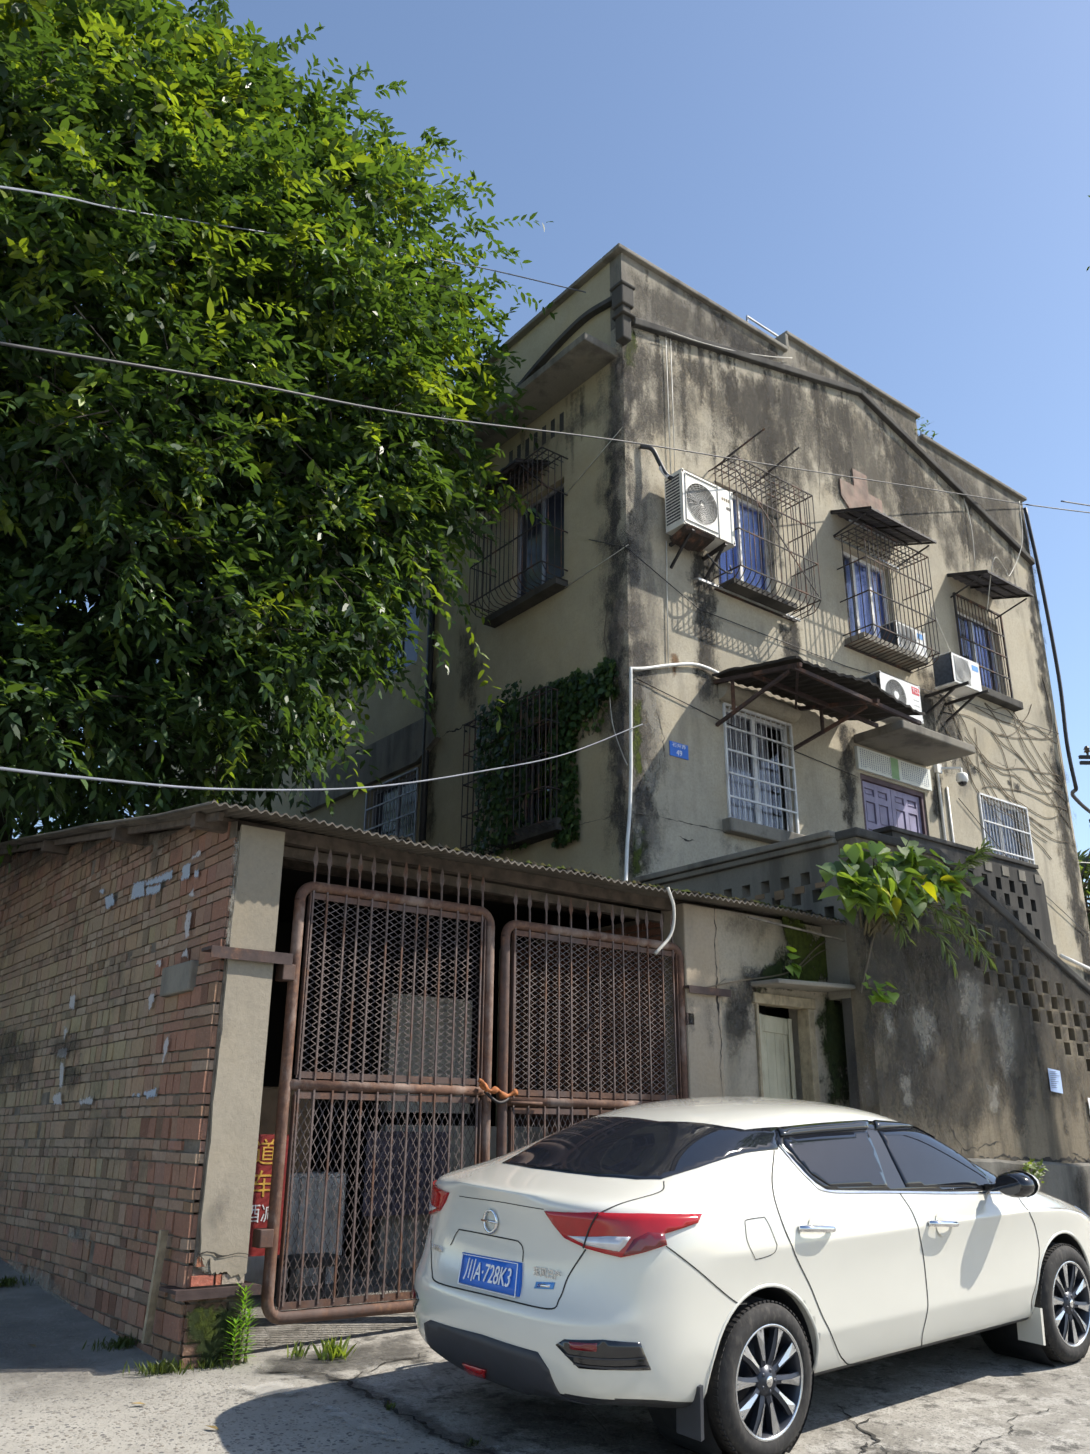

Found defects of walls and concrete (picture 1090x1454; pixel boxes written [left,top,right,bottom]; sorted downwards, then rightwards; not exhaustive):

leakage [655,301,849,568]
leakage [604,348,657,874]
peeling [100,851,201,957]
leakage [853,409,1090,1133]
flaking render [179,1256,245,1370]
leakage [1077,1172,1090,1212]